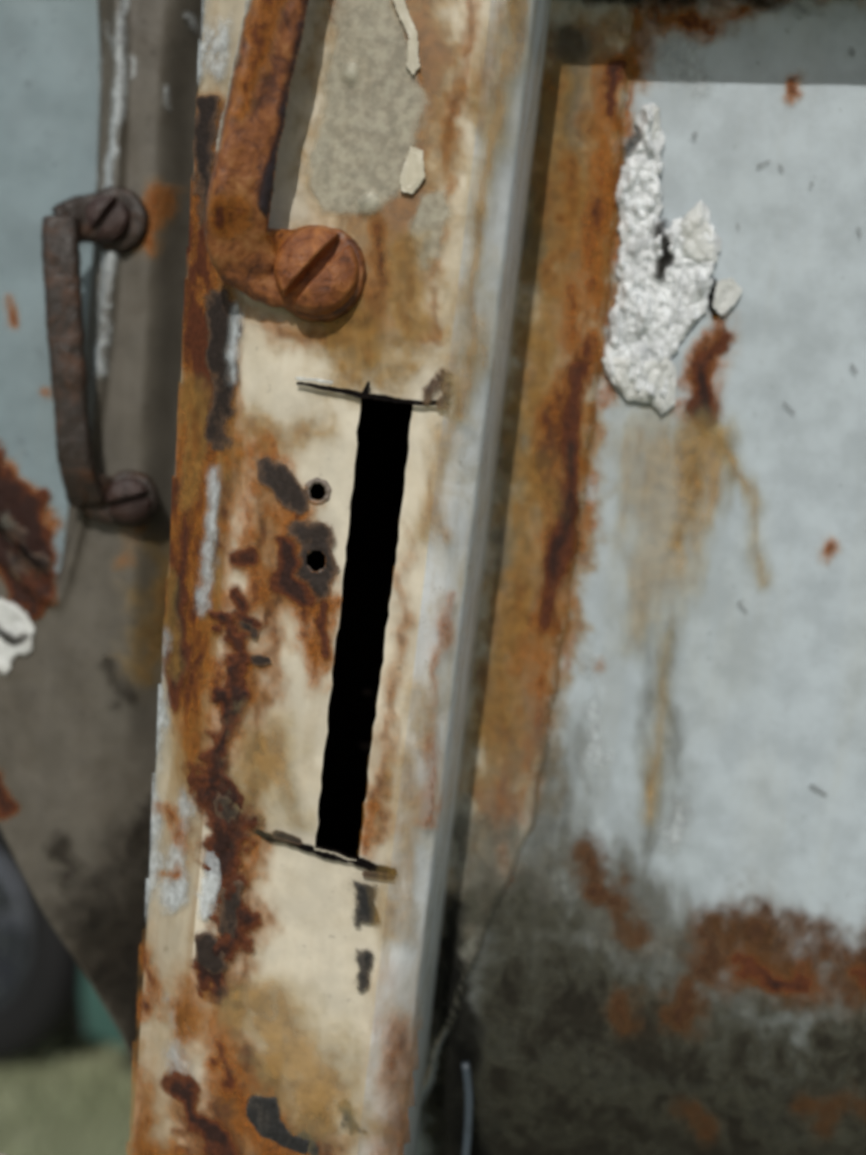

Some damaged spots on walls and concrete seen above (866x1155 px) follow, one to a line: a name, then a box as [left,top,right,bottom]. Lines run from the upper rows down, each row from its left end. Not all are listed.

rust [263,0,475,384]
peeling [311,0,448,261]
peeling [602,103,743,415]
rust [787,76,800,101]
rust [471,0,788,831]
rust [0,448,57,620]
rust [825,540,836,555]
peeling [0,598,35,675]
rust [128,158,346,1155]
rust [0,774,20,820]
rust [574,840,649,948]
rust [661,897,866,1032]